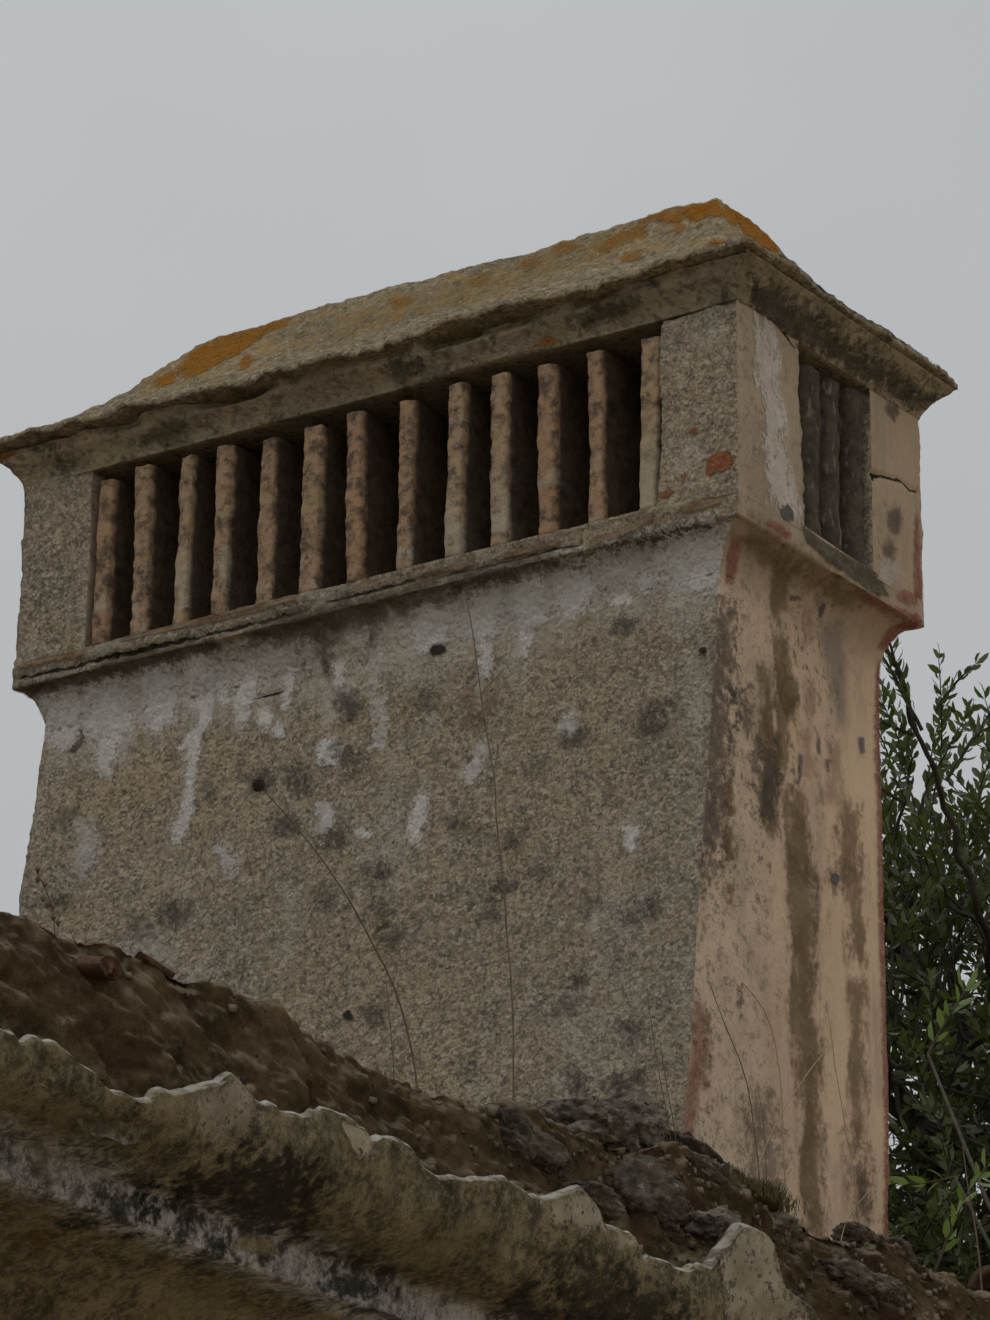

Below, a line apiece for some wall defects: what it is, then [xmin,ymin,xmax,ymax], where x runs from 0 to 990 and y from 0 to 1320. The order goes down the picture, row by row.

crack [870,473,917,493]
water stain [17,513,868,1238]
water stain [63,1143,333,1275]
water stain [857,1169,873,1223]
water stain [305,1251,408,1318]